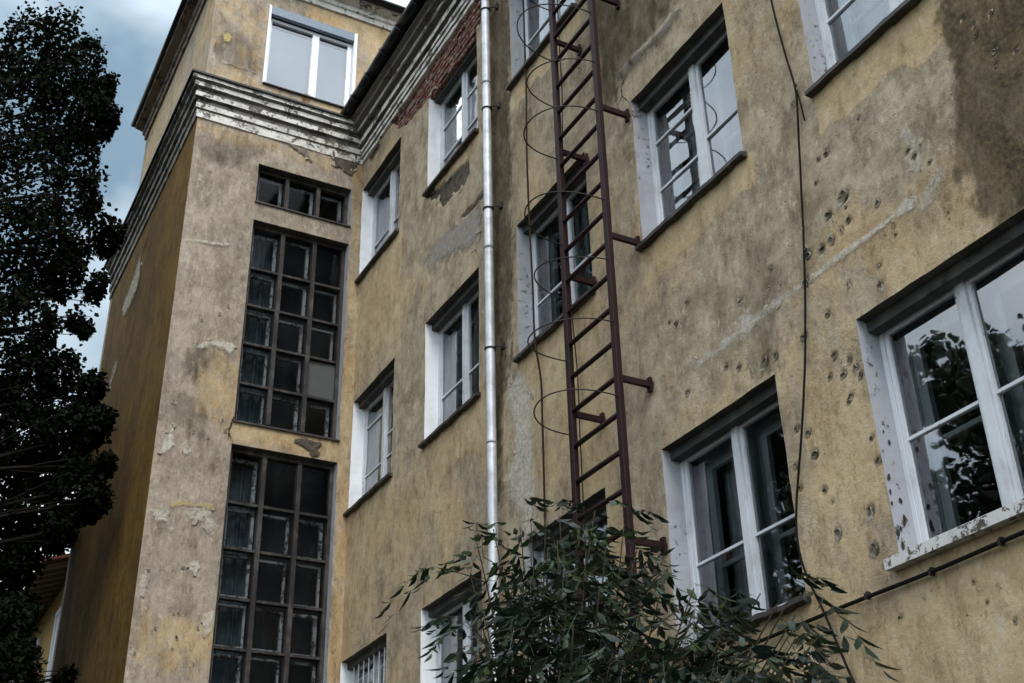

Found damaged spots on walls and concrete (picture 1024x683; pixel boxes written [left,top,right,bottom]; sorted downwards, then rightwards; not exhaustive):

flaking render [395,0,481,129]
damp [936,0,1024,223]
spalling [289,139,312,163]
spalling [331,151,357,175]
spalling [428,163,470,207]
spalling [805,188,850,259]
spalling [827,352,862,379]
spalling [294,437,322,457]
peeling [887,474,909,550]